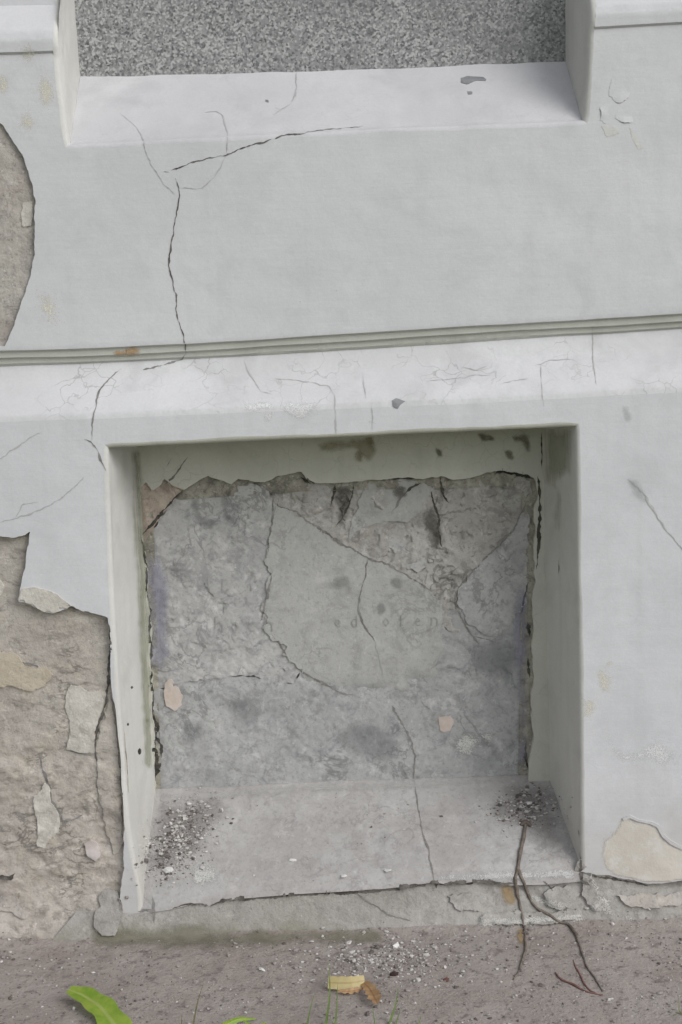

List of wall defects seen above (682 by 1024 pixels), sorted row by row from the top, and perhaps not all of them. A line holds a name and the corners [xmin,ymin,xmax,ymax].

peeling [461,76,486,95]
flaking render [0,123,36,346]
crack [121,73,353,370]
crack [2,371,118,522]
spalling [141,476,532,789]
crack [261,504,428,695]
water stain [324,437,374,460]
crack [393,478,449,548]
crack [454,505,532,644]
flaking render [0,532,141,939]
crack [138,706,514,923]
peeling [448,815,682,927]